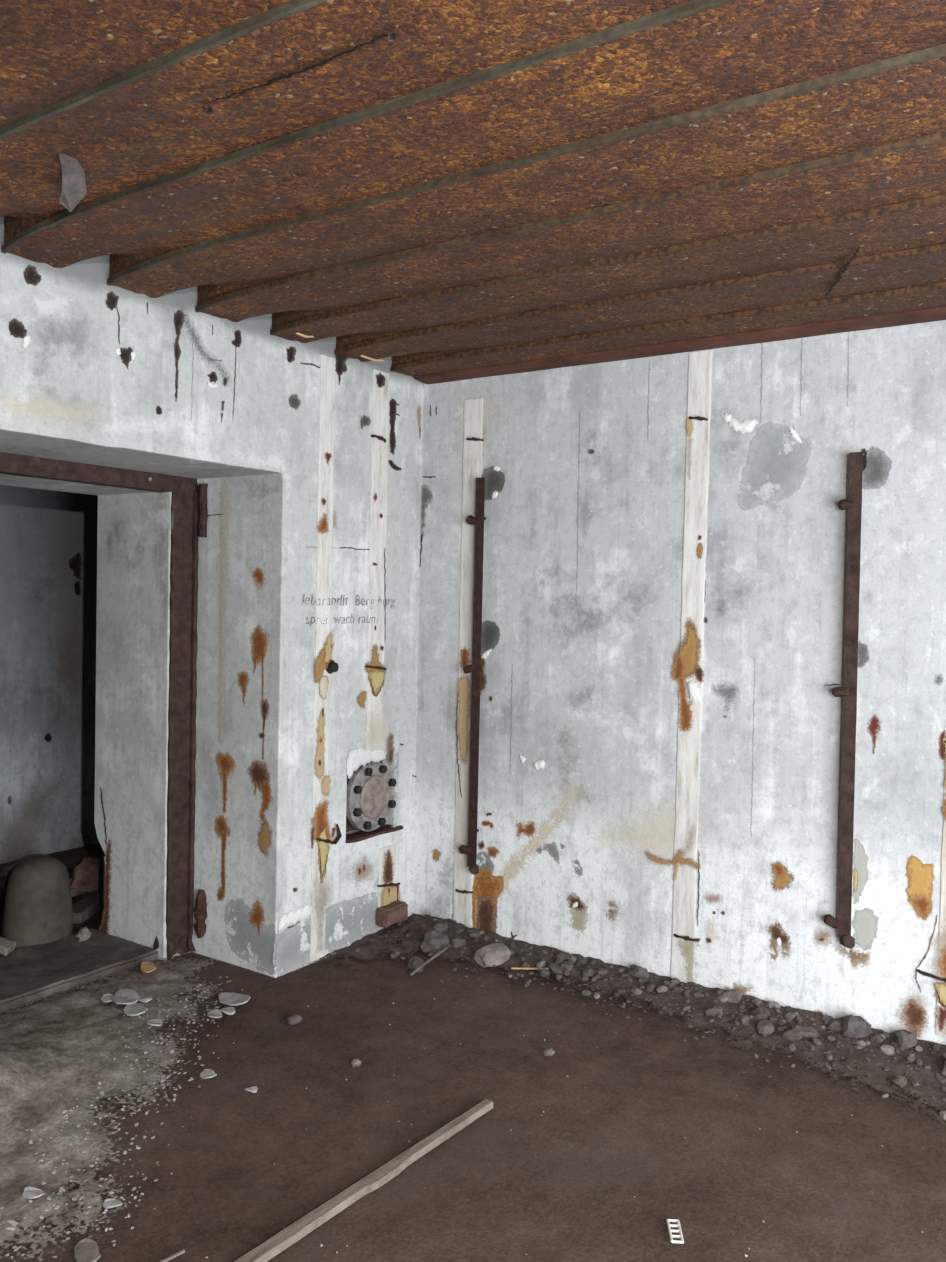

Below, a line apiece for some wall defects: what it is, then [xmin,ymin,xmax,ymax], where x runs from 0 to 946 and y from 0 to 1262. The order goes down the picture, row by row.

rust [214,626,273,901]
rust [311,633,336,883]
rust [458,477,504,933]
rust [671,619,704,731]
rust [938,730,946,759]
rust [771,861,795,893]
rust [906,855,935,920]